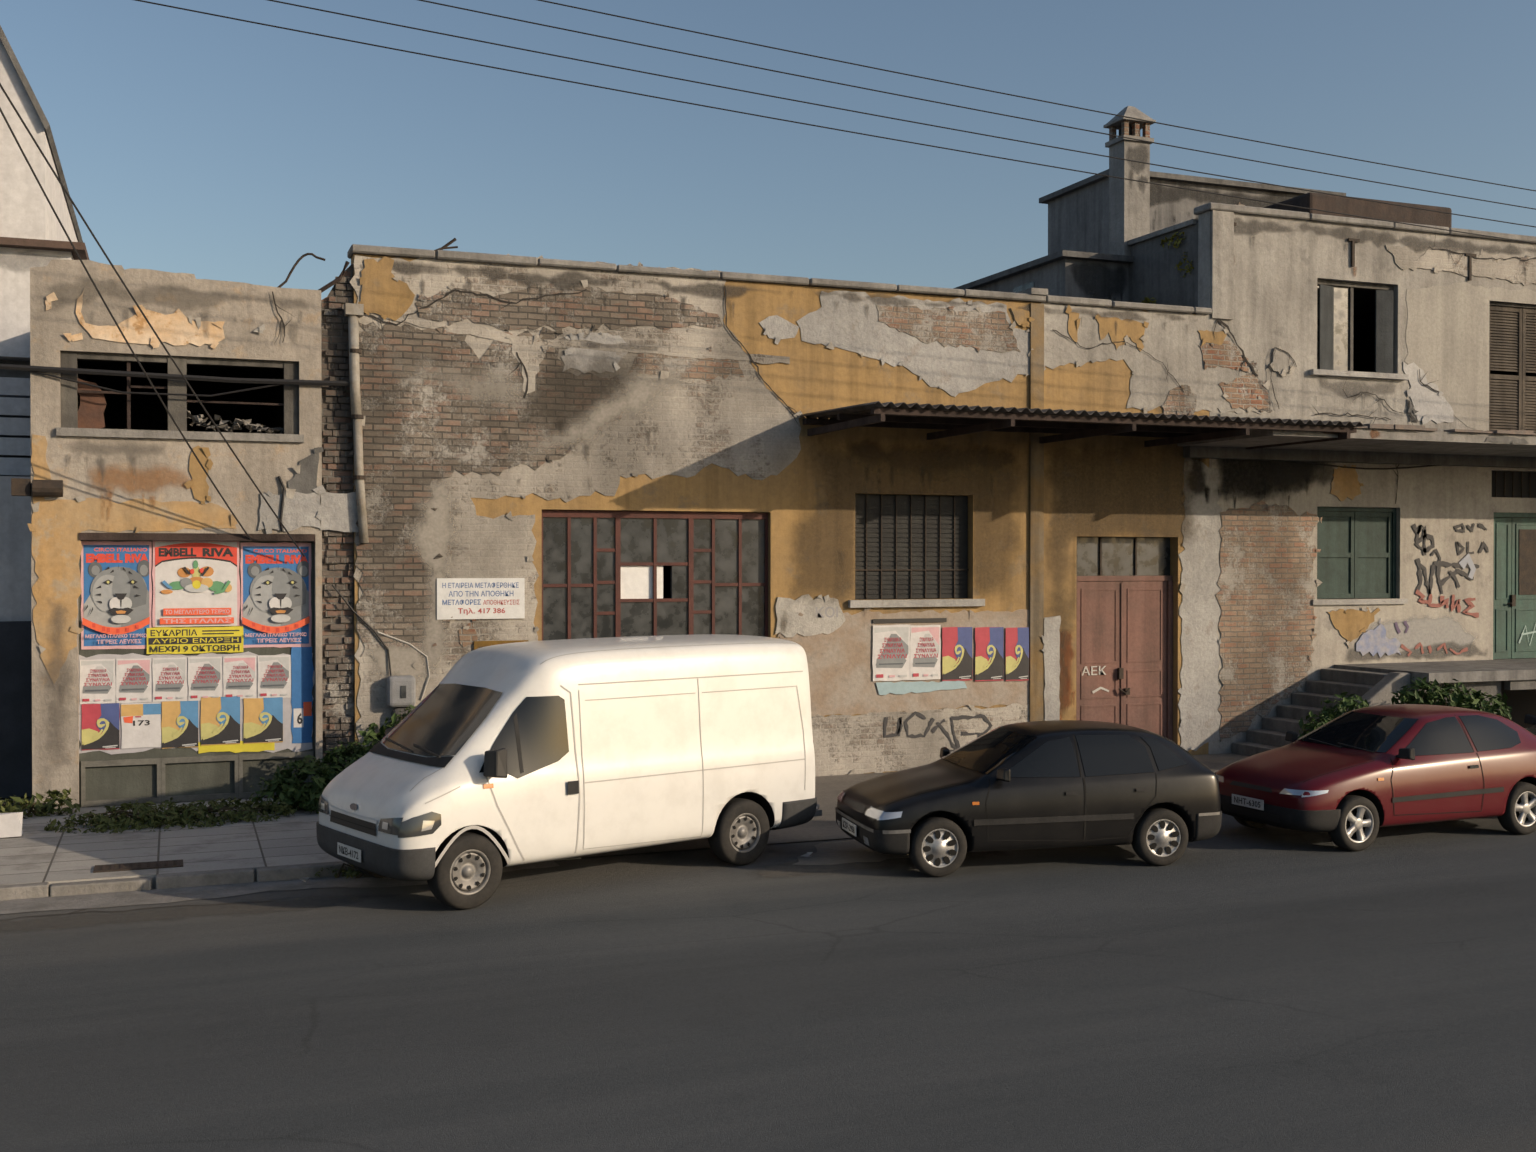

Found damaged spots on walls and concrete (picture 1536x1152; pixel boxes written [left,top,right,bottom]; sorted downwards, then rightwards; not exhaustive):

peeling [45,292,58,311]
peeling [63,290,225,349]
peeling [759,291,1271,417]
crack [1417,234,1536,265]
peeling [349,254,803,748]
leakage [1268,460,1332,504]
flaking render [1178,458,1380,751]
peeling [777,607,1061,776]